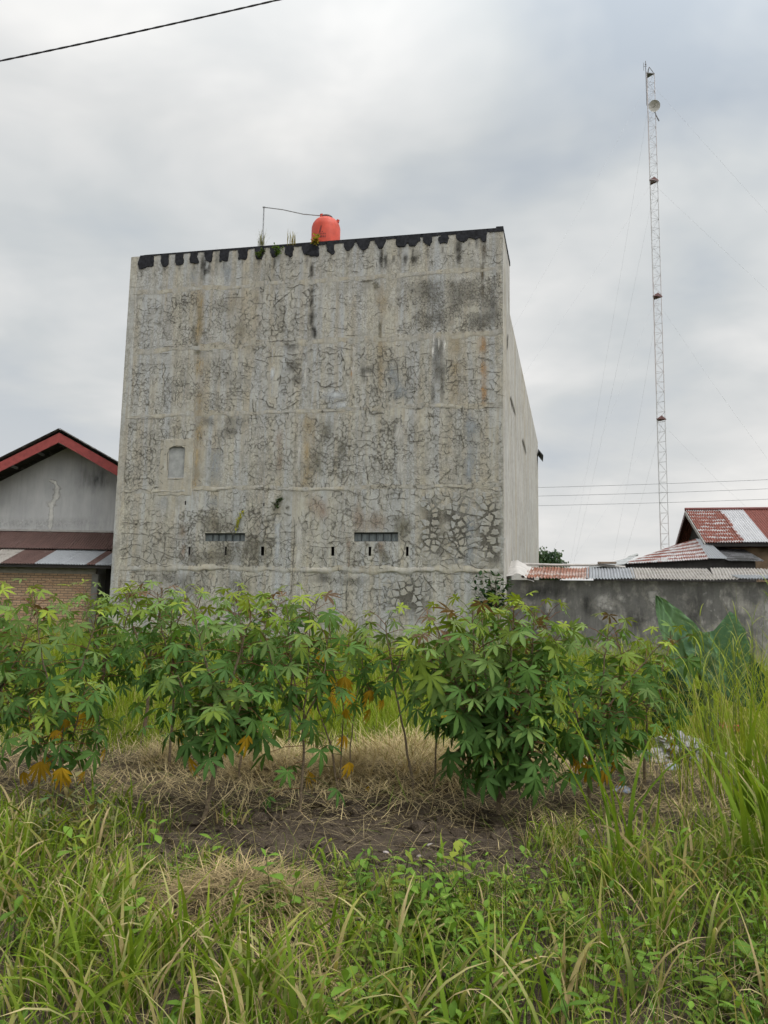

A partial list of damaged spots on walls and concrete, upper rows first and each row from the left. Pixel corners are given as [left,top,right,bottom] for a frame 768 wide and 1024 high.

crack [48,479,60,530]
crack [119,246,526,630]